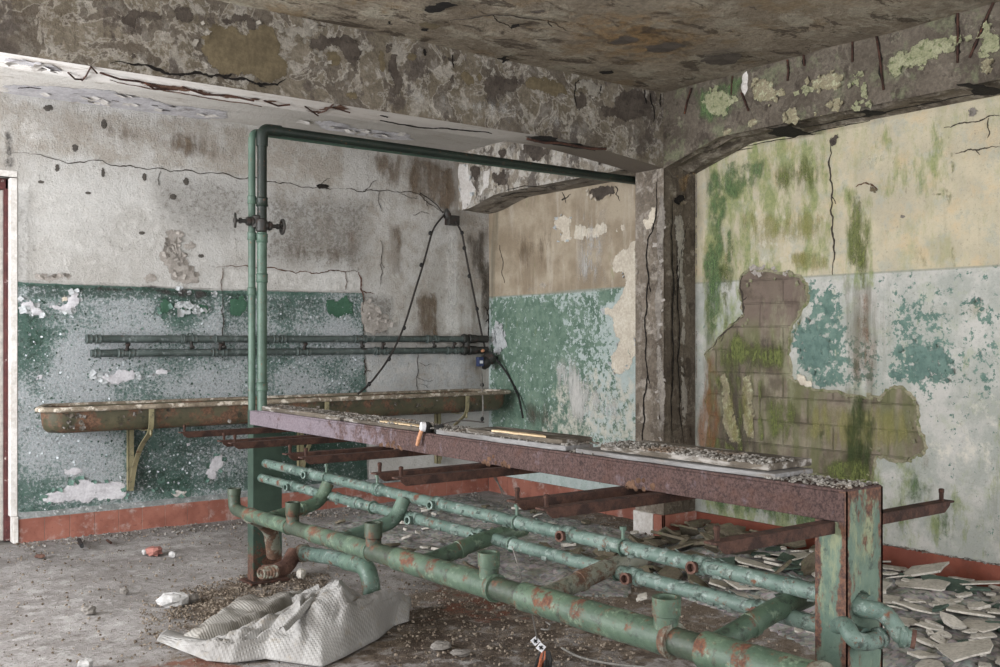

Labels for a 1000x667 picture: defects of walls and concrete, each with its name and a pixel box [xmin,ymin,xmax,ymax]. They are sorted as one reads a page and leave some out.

crack [110,61,285,107]
crack [944,115,999,155]
crack [15,152,444,215]
crack [737,94,975,275]
crack [216,240,384,376]
peeling [490,320,507,355]
peeling [600,241,635,375]
crack [641,182,692,443]
water stain [704,244,726,328]
peeling [791,317,831,388]
peeling [17,285,363,510]